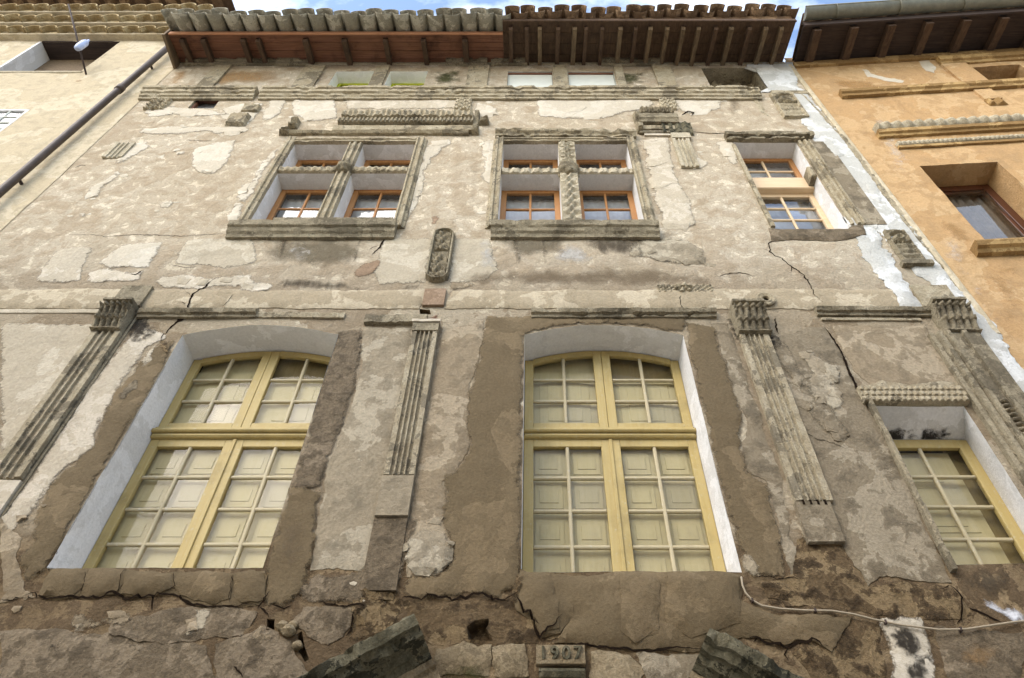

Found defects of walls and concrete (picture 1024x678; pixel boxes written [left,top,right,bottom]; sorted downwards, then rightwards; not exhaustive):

peeling [537,100,654,120]
peeling [675,100,727,115]
peeling [84,100,456,200]
crack [161,265,232,338]
crack [762,241,823,302]
peeling [771,333,850,442]
crack [825,328,870,412]
peeling [402,516,455,577]
crack [1,570,291,617]
spalling [467,618,493,641]
crack [400,589,701,652]
crack [940,585,1001,624]